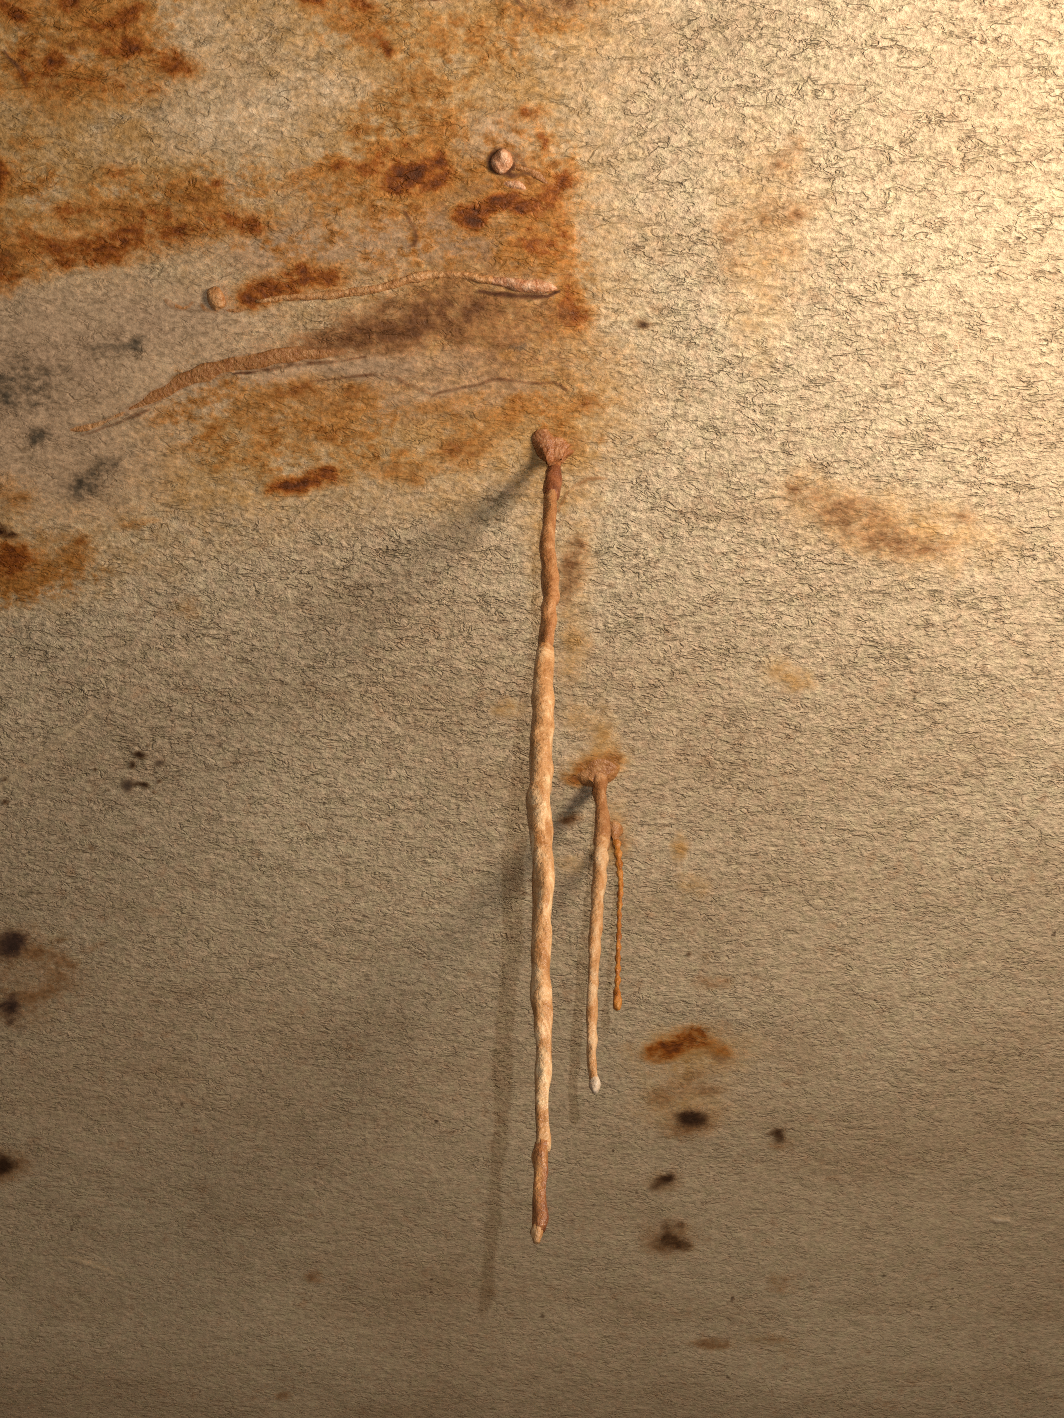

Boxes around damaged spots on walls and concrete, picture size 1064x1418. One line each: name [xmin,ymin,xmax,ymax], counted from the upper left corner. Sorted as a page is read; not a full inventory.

rust [0,0,593,339]
rust [305,290,503,351]
rust [153,377,603,496]
rust [0,524,96,609]
rust [561,539,586,595]
rust [564,716,622,786]
water stain [0,931,76,1024]
rust [645,1026,732,1136]
water stain [0,1153,22,1181]